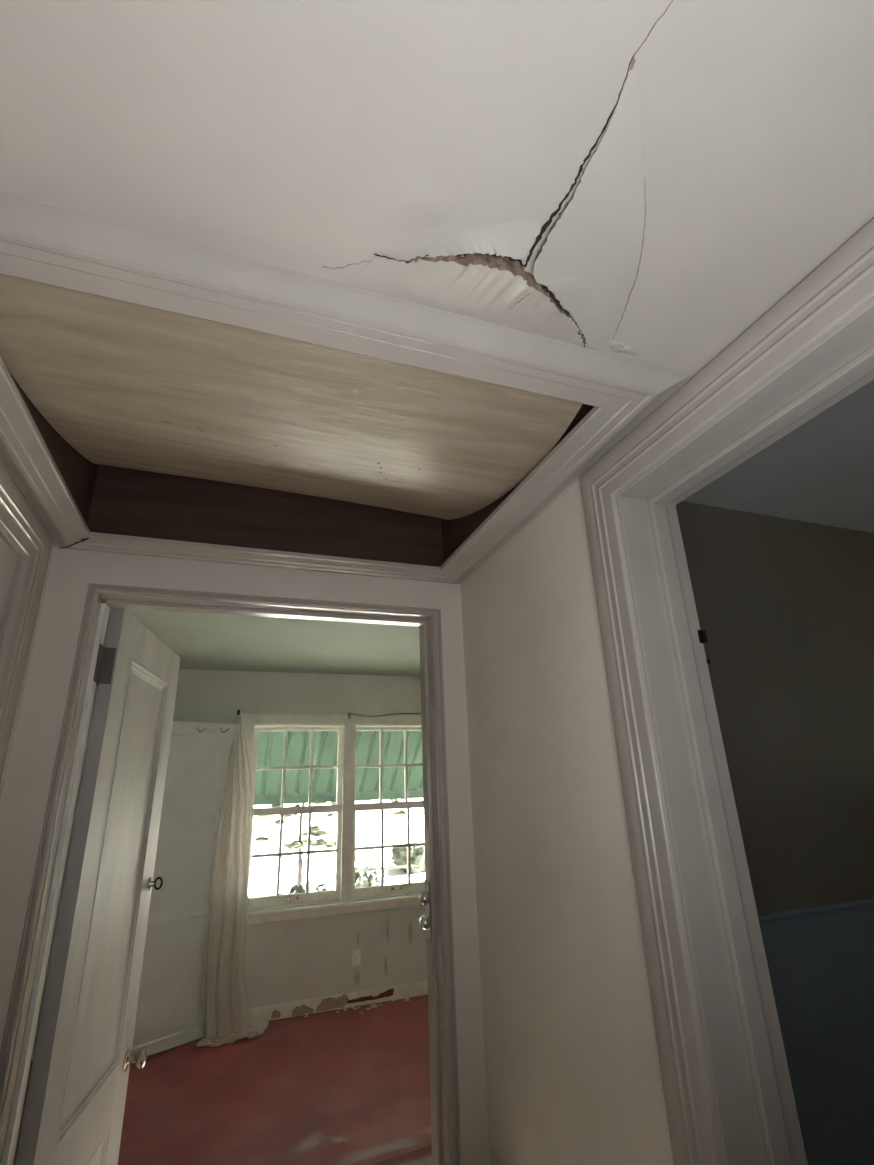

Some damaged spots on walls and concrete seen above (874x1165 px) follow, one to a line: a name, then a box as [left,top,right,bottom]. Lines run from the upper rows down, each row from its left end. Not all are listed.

crack [457,0,673,348]
crack [322,253,429,269]
peeling [271,994,349,1019]